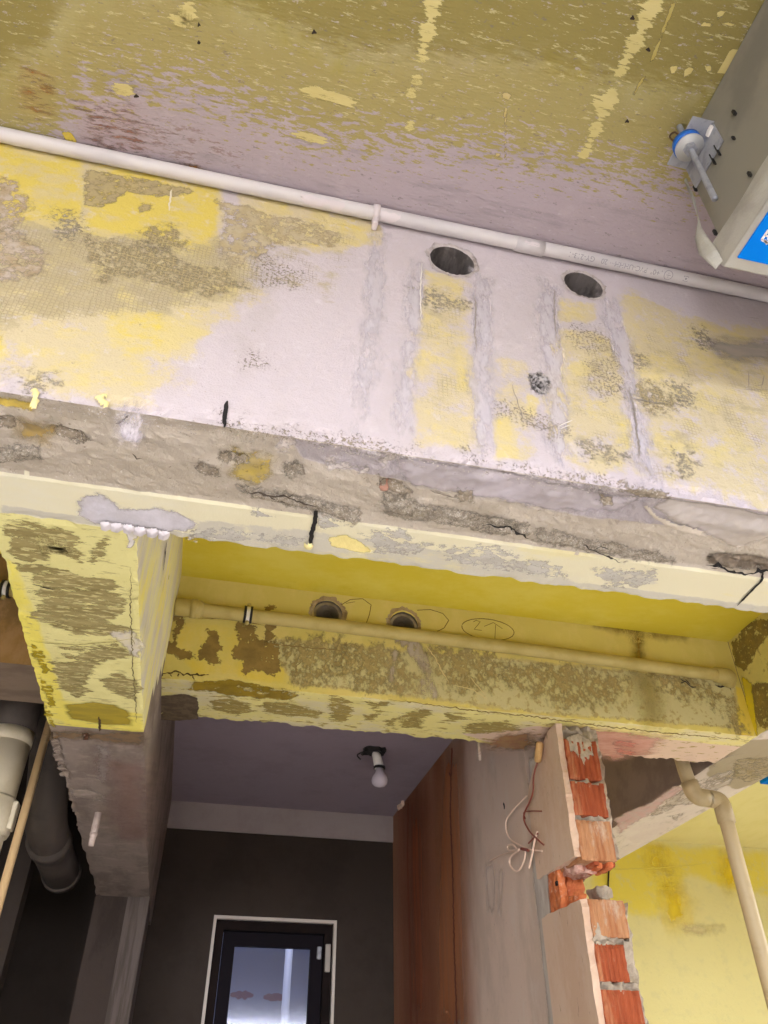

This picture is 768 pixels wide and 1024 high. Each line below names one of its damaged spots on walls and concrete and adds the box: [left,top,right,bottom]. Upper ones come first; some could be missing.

spalling [88,400,675,563]
crack [244,490,318,544]
crack [482,524,529,539]
crack [585,545,620,563]
spalling [707,553,768,570]
crack [708,562,768,606]
peeling [2,519,143,778]
crack [162,670,209,679]
peeling [161,616,525,734]
peeling [426,645,630,710]
peeling [651,673,768,735]
peeling [731,619,768,671]